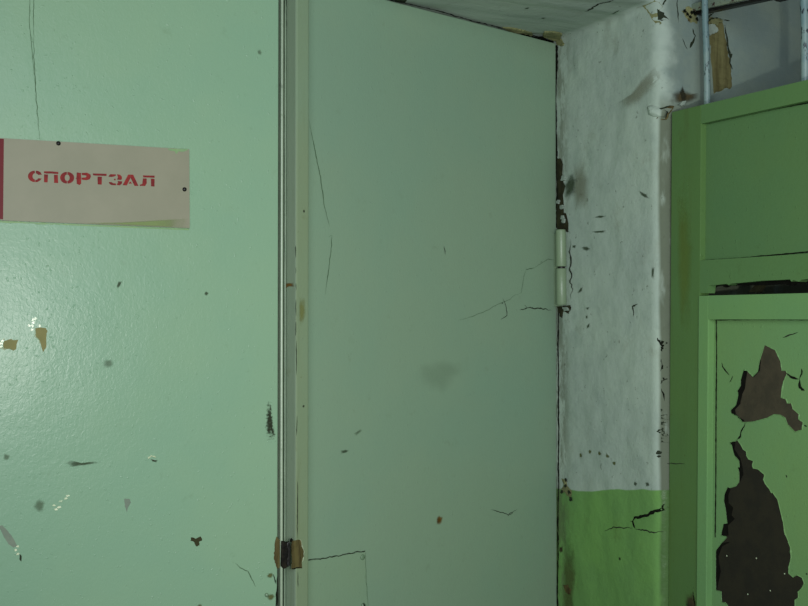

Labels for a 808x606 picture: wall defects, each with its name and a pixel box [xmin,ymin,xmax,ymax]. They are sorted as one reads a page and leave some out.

crack [29,1,40,137]
spalling [502,27,564,46]
spalling [682,6,698,24]
spalling [709,17,732,93]
peeling [0,339,18,351]
peeling [28,317,47,352]
peeling [731,345,804,433]
crack [461,259,559,606]
crack [605,504,665,533]
peeling [715,439,805,606]